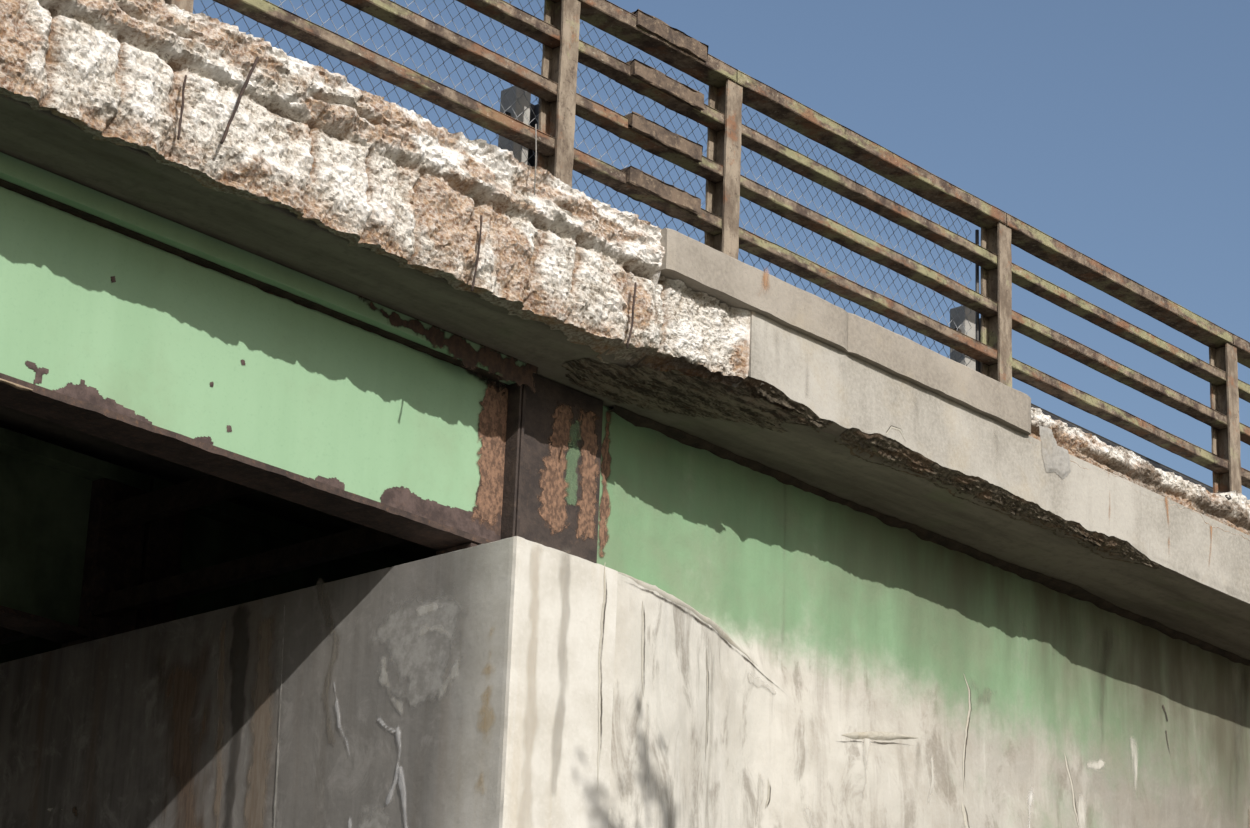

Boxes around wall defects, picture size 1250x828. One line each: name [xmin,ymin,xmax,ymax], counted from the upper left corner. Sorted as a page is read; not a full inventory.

rust [0,178,538,536]
spalling [0,0,1162,569]
rust [538,404,612,557]
spalling [1026,407,1250,541]
damp [165,605,285,828]
crack [703,659,711,748]
crack [756,779,771,822]
crack [962,676,972,828]
crack [1064,753,1104,828]